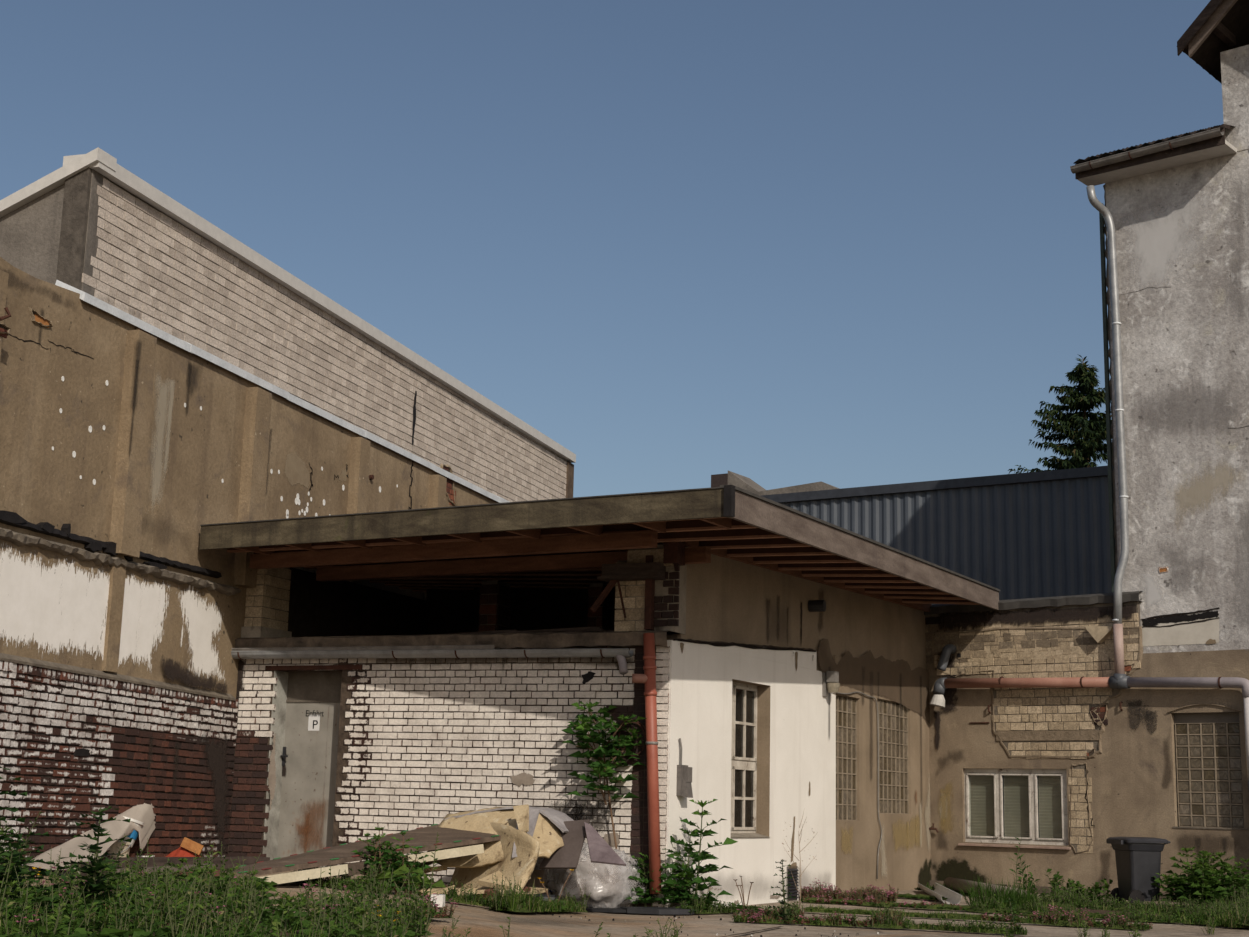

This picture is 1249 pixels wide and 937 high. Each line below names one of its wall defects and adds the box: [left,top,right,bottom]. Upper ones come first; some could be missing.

spalling [0,323,11,338]
spalling [28,307,53,328]
crack [9,334,94,359]
leakage [152,381,188,501]
crack [409,391,417,509]
peeling [0,543,110,661]
peeling [118,573,225,683]
spalling [932,613,1220,854]
corrosion [300,805,324,852]